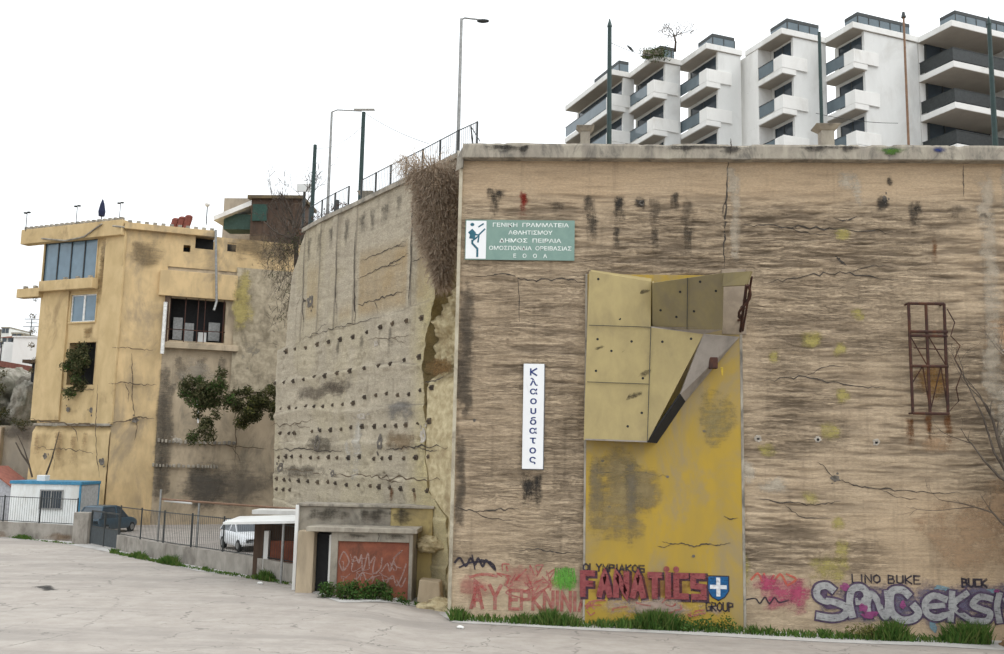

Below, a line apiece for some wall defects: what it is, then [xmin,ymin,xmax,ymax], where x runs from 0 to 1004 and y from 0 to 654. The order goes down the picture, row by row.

leakage [585,198,598,233]
crack [722,139,899,283]
leakage [979,182,1004,442]
leakage [153,367,174,497]
leakage [591,453,657,536]
crack [658,516,736,548]
crack [762,463,959,518]